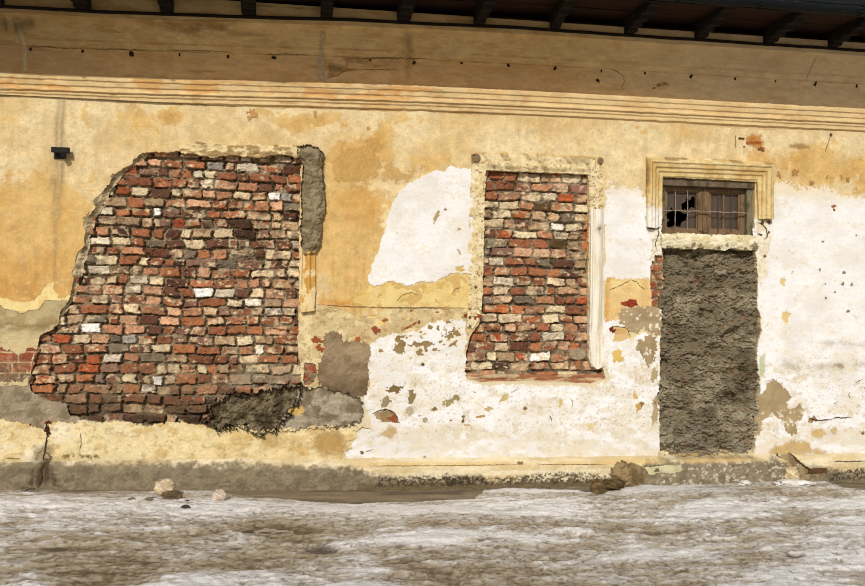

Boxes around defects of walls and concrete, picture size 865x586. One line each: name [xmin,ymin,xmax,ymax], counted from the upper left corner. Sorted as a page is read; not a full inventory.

flaking render [756,219,771,287]
flaking render [0,152,482,426]
peeling [604,225,664,383]
peeling [450,393,508,426]
peeling [633,390,660,426]
peeling [753,379,804,438]